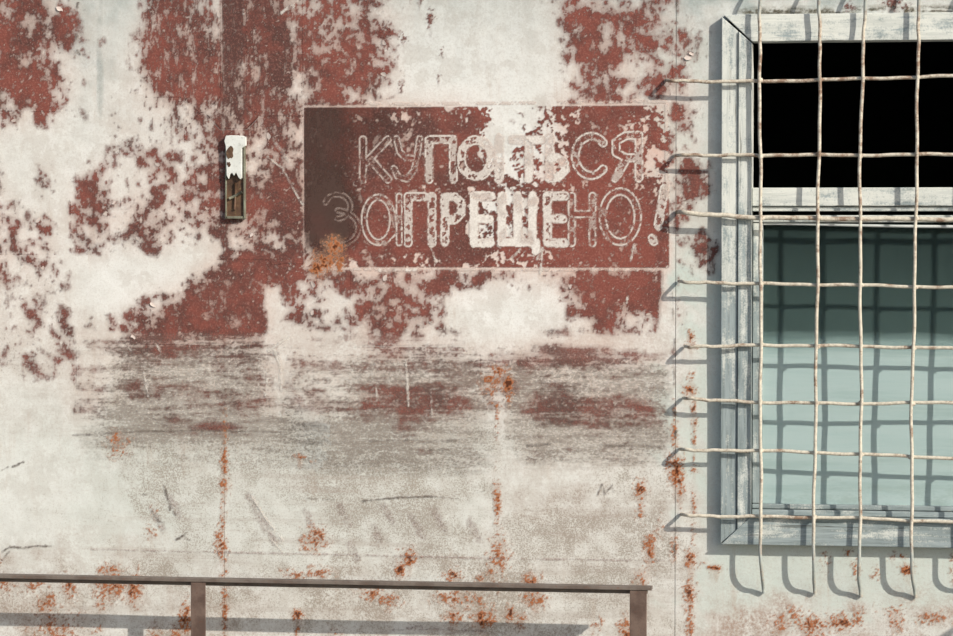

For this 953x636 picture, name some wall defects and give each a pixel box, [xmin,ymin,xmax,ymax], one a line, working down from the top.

peeling [0,0,89,129]
peeling [552,0,719,274]
peeling [0,201,69,288]
peeling [69,0,667,468]
peeling [21,299,80,381]
corrosion [481,365,514,427]
corrosion [95,565,143,609]
corrosion [393,549,417,577]
corrosion [476,483,509,583]
corrosion [437,569,548,629]
corrosion [665,408,721,636]
corrosion [773,606,865,636]